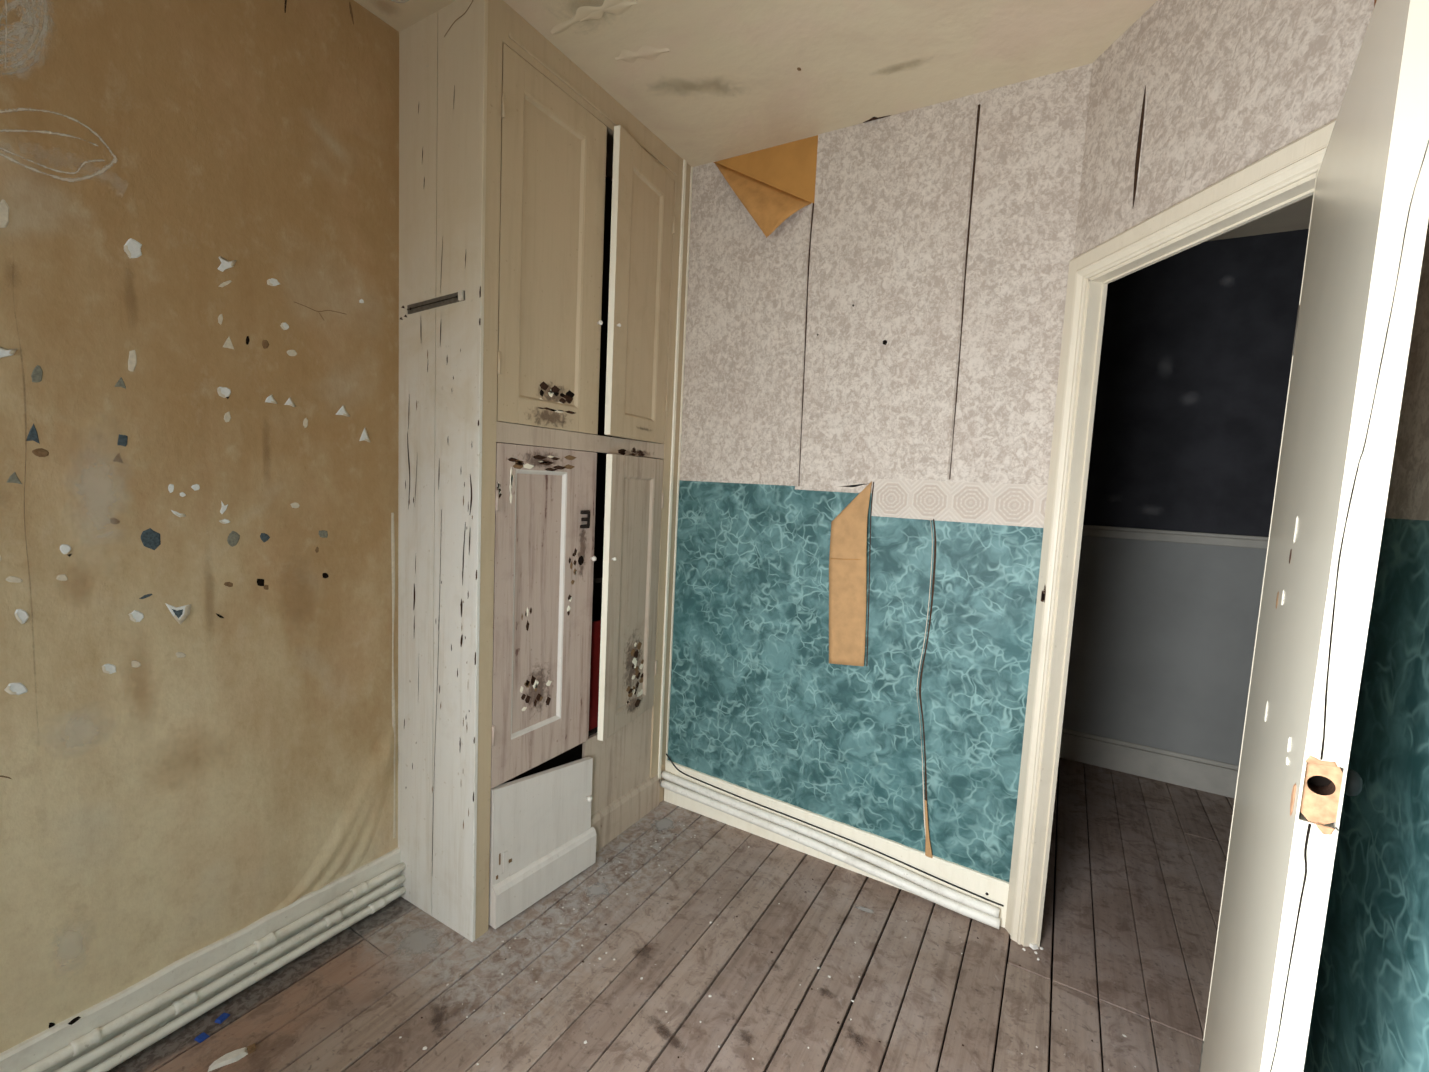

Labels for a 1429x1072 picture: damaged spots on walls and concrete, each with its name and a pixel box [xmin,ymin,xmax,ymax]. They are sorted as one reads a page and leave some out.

peeling [716,135,818,203]
spalling [124,238,142,258]
spalling [218,256,236,272]
spalling [217,387,231,422]
spalling [265,395,308,428]
peeling [26,423,40,444]
peeling [117,434,128,447]
spalling [168,484,200,517]
peeling [141,528,161,550]
peeling [219,501,240,547]
peeling [829,481,874,666]
spalling [129,594,191,624]